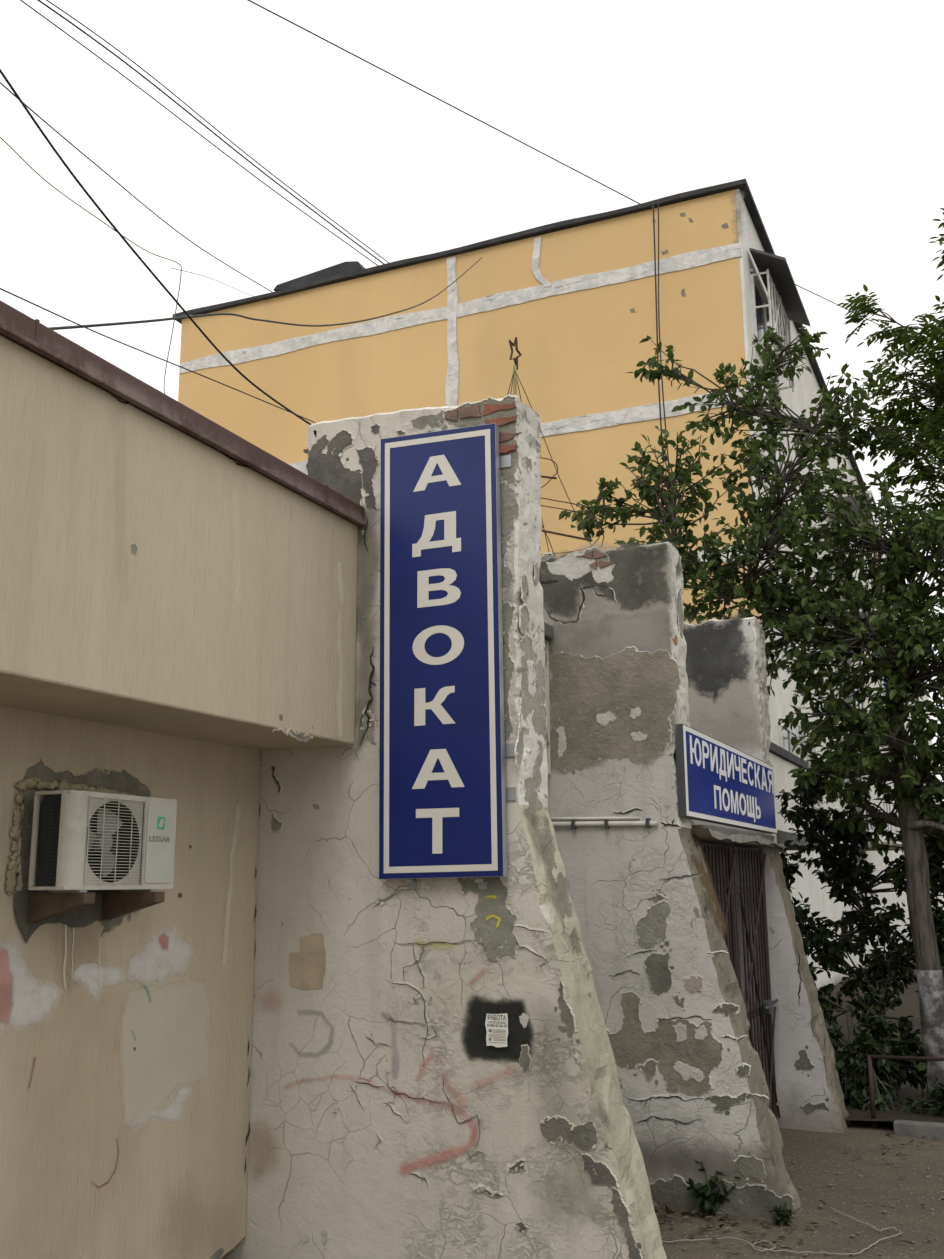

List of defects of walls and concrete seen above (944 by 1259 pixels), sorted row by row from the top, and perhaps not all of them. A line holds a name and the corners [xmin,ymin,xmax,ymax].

peeling [303,424,381,511]
peeling [395,394,684,812]
leakage [682,615,750,699]
crack [660,873,702,882]
crack [511,924,550,964]
crack [330,940,486,1158]
peeling [606,893,781,1115]
crack [655,1015,749,1041]
crack [625,1094,703,1128]
peeling [507,1158,527,1174]
peeling [514,1221,529,1233]
peeling [540,1115,643,1259]